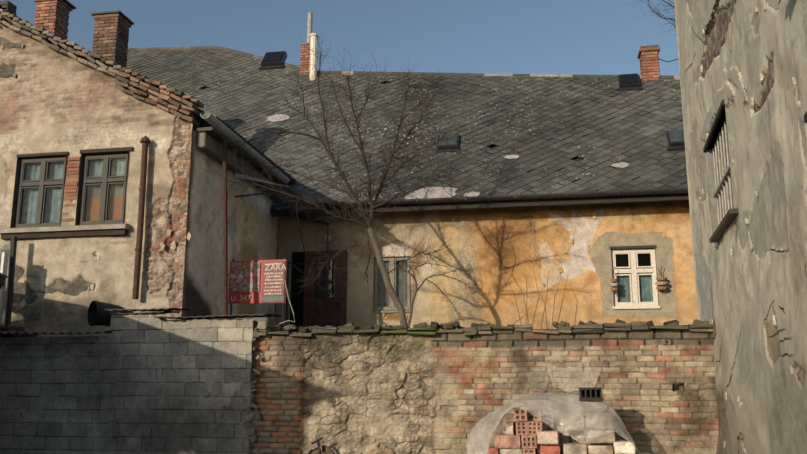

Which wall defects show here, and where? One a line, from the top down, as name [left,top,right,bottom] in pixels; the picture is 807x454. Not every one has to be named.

spalling [696,0,737,83]
spalling [751,58,774,113]
flaking render [143,113,192,317]
peeling [537,208,610,287]
peeling [13,266,96,308]
crack [716,329,750,388]
crack [764,302,794,357]